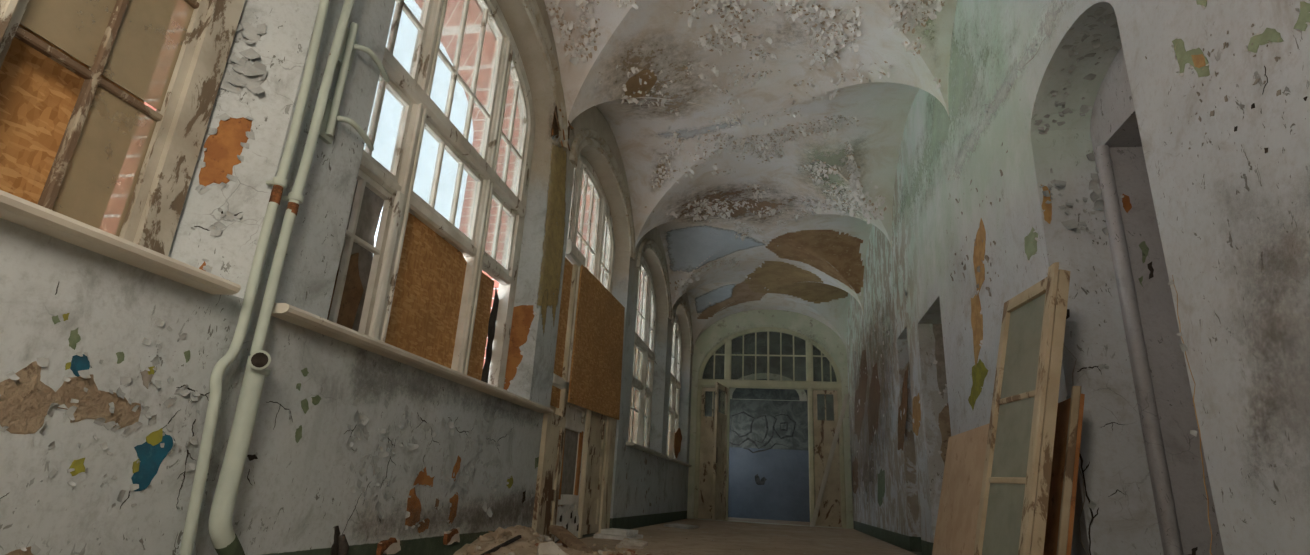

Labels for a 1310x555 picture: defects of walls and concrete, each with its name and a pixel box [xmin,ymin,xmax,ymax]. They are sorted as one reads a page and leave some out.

peeling [195,113,255,195]
spalling [551,106,574,151]
peeling [546,0,638,87]
flaking render [616,63,679,137]
peeling [644,0,894,319]
peeling [888,0,945,56]
peeling [1171,1,1310,135]
peeling [0,313,195,508]
peeling [504,304,537,391]
crack [1064,345,1109,399]
peeling [404,455,461,536]
crack [1078,422,1127,555]